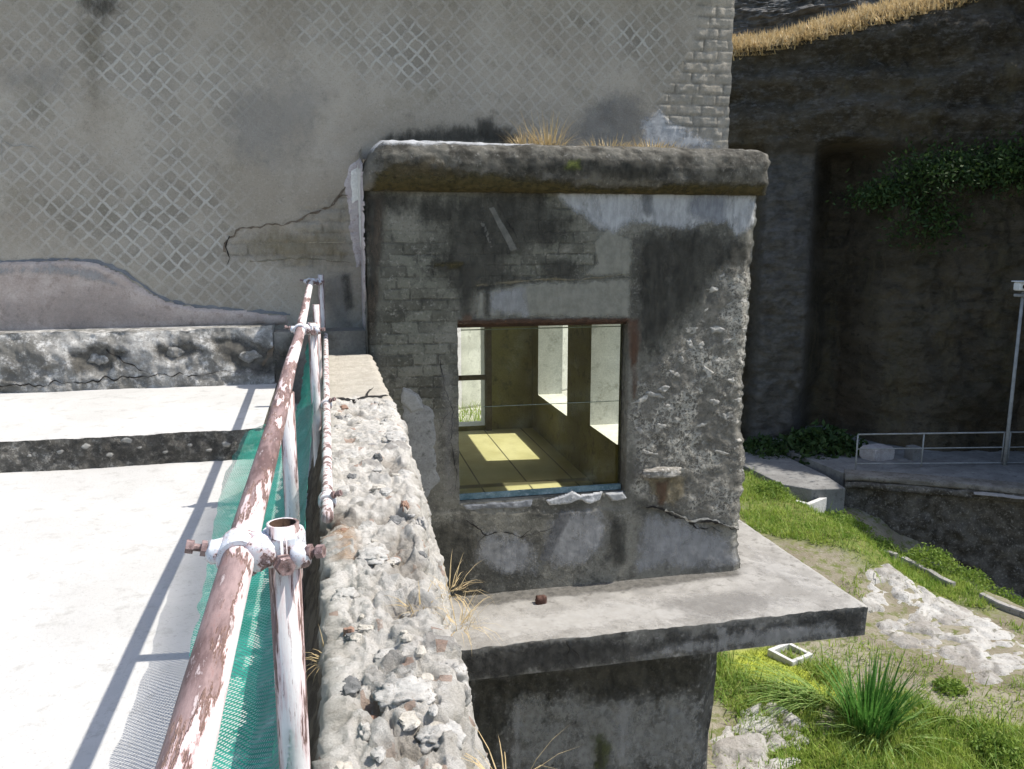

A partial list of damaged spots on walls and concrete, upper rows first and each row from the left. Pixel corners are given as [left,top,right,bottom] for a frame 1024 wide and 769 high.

damp [371,121,524,150]
crack [223,187,347,264]
peeling [344,158,367,329]
peeling [0,260,289,330]
damp [639,227,748,352]
crack [338,389,388,403]
spalling [463,499,532,510]
spalling [546,491,627,505]
crack [646,506,739,533]